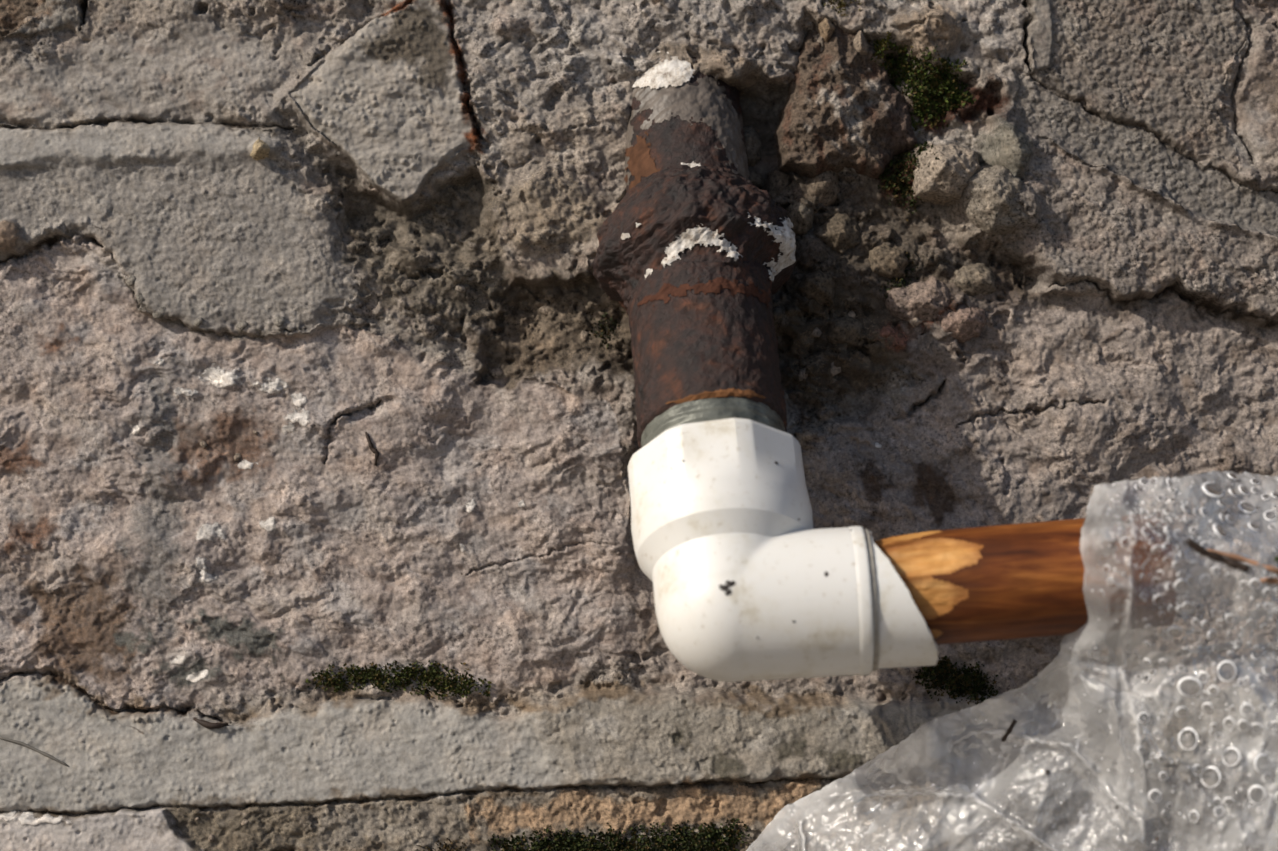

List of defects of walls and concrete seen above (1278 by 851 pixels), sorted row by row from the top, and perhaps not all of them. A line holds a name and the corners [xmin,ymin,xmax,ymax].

crack [80,0,88,28]
crack [1023,0,1031,76]
crack [1087,280,1278,327]